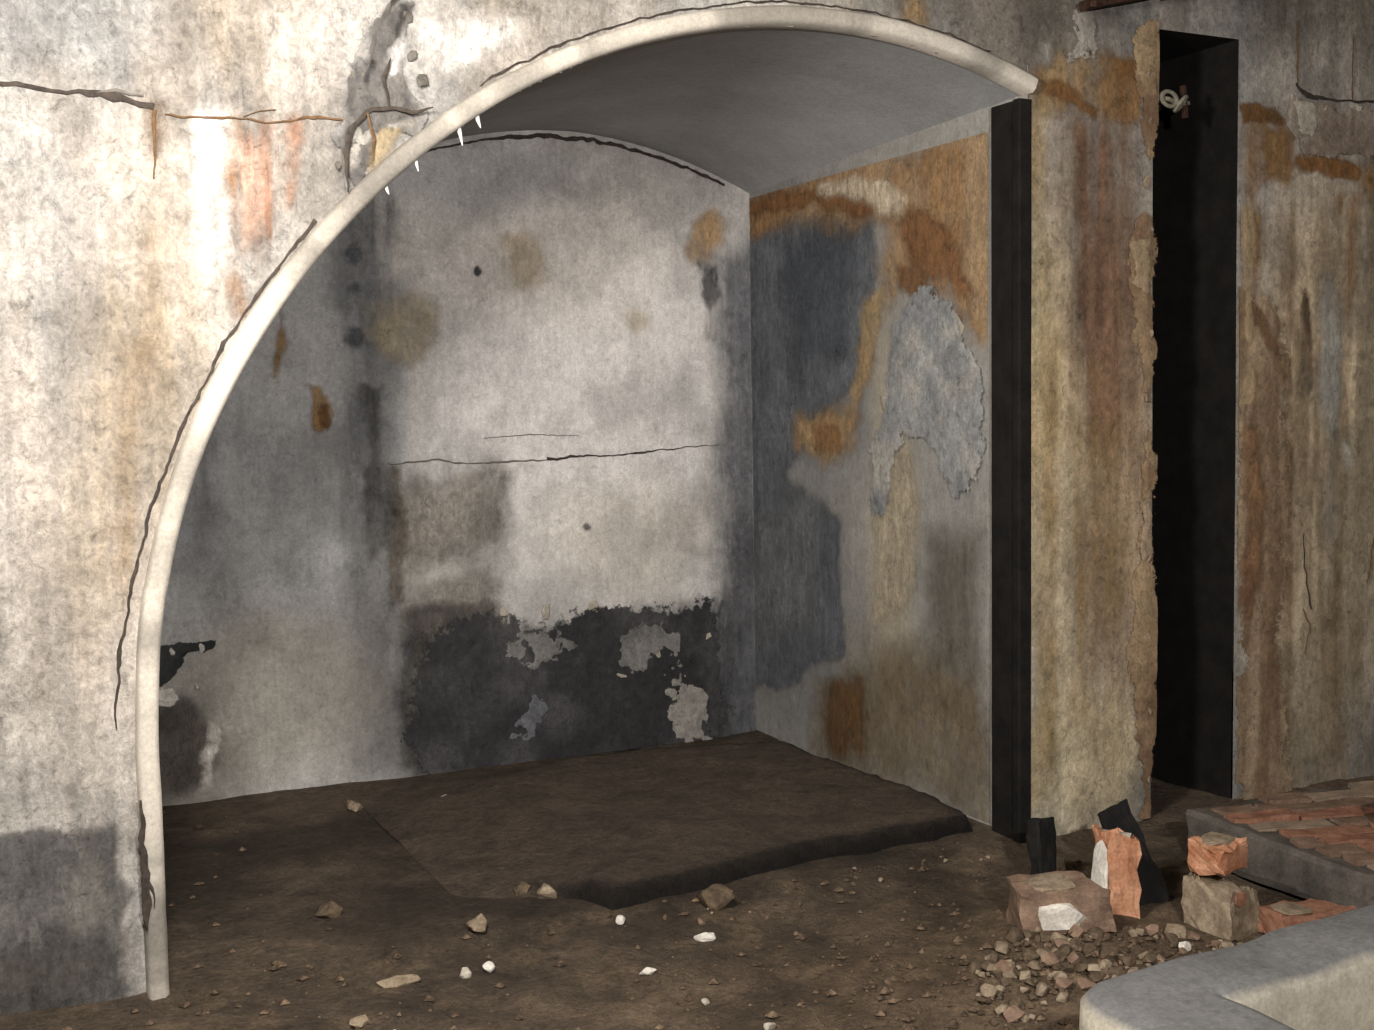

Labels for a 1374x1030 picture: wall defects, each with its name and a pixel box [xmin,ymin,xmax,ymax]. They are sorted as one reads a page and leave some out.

crack [480,0,991,86]
crack [0,0,433,192]
rust [1037,54,1141,122]
crack [426,133,725,186]
rust [1240,103,1374,271]
crack [114,218,317,729]
crack [387,434,719,465]
peeling [159,640,216,707]